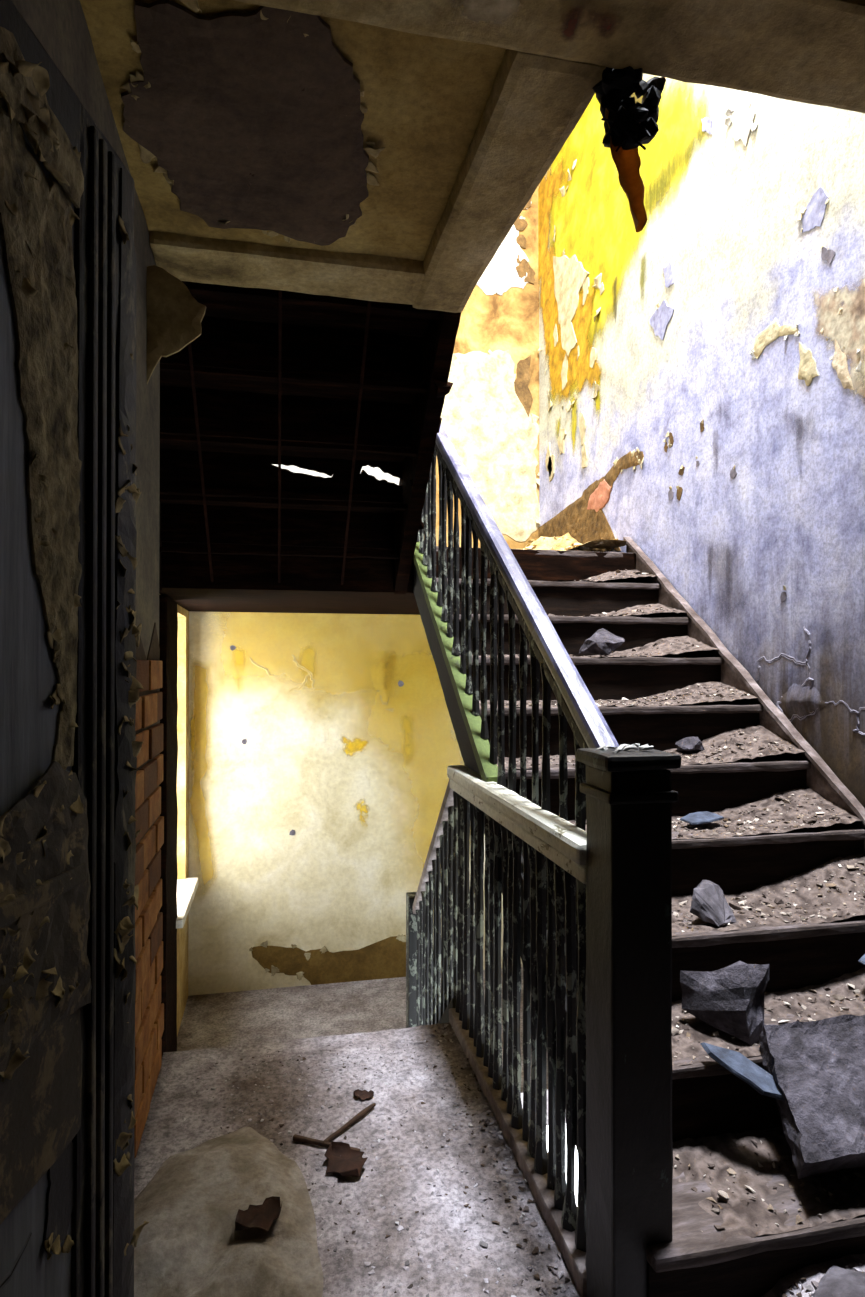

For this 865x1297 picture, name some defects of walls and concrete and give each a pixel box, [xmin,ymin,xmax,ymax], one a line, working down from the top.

spalling [120,0,385,246]
peeling [605,109,648,232]
peeling [821,245,836,264]
peeling [440,159,644,552]
spalling [749,278,865,398]
peeling [272,464,333,478]
peeling [360,465,400,485]
spalling [668,456,700,501]
peeling [0,27,92,1082]
peeling [113,168,206,1297]
crack [757,626,865,735]
spalling [249,934,406,985]